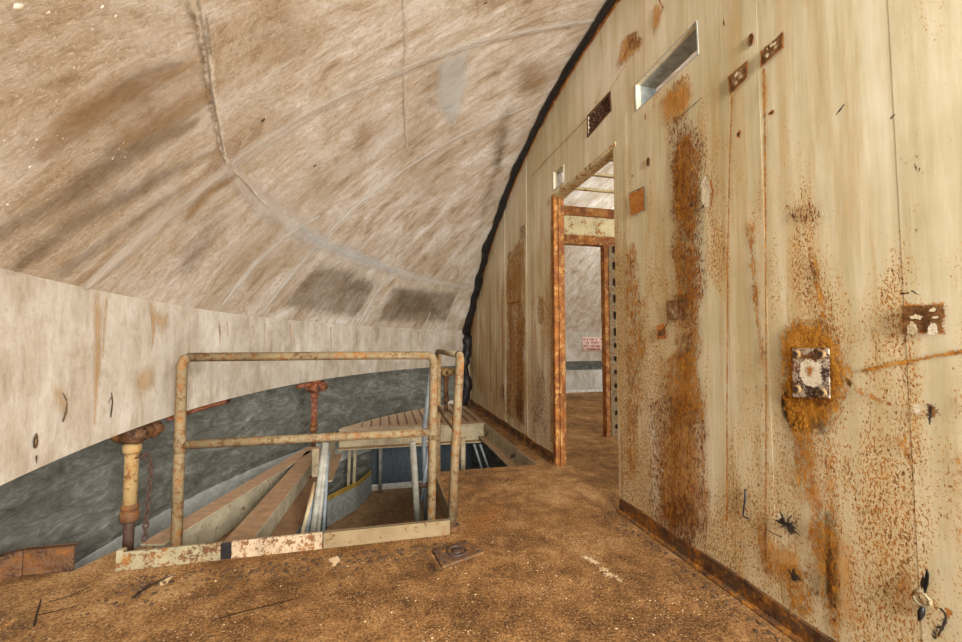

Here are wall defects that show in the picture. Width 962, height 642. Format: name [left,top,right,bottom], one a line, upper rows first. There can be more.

rust [94,299,107,423]
leakage [85,19,595,328]
rust [479,225,552,438]
rust [618,32,642,69]
rust [621,74,710,549]
rust [725,95,741,521]
rust [746,68,962,642]